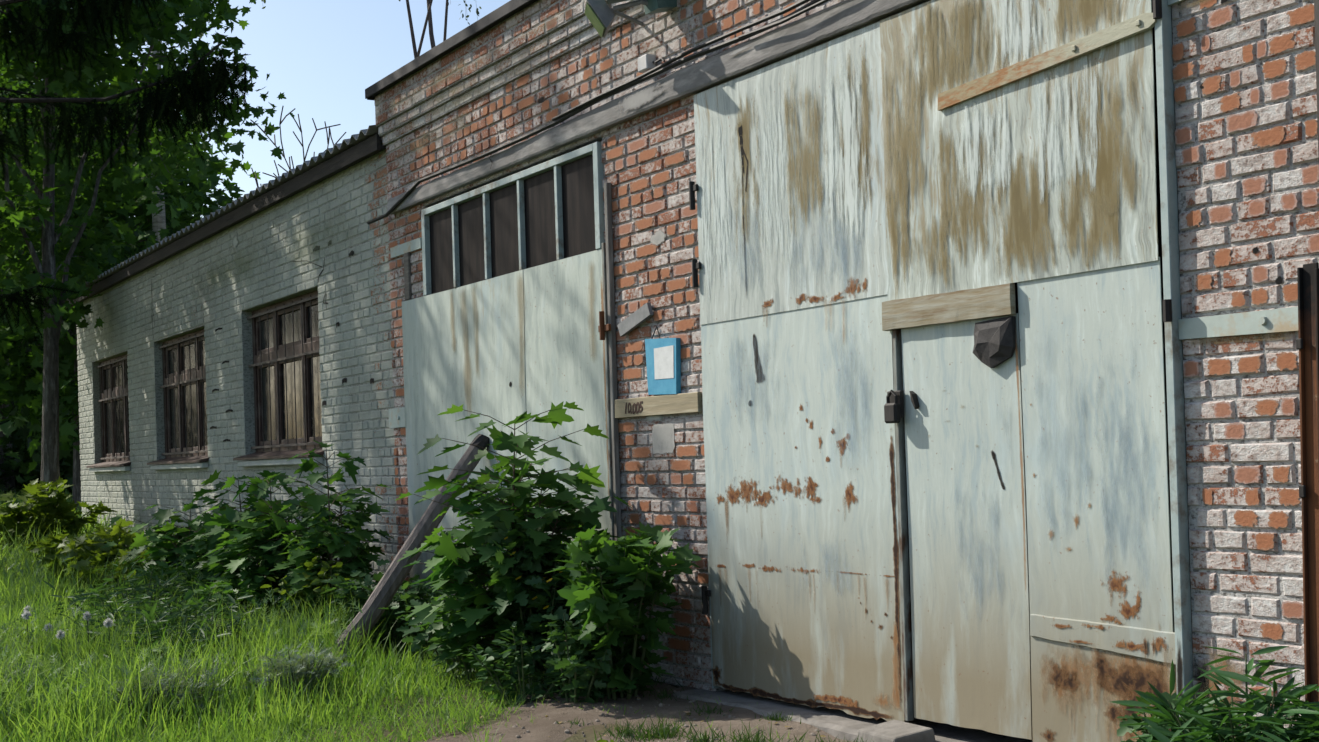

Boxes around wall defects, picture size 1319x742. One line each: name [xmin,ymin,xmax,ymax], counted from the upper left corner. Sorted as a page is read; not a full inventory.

damp [999,0,1041,63]
damp [824,67,869,244]
damp [959,95,1010,197]
damp [1037,56,1097,197]
peeling [1172,0,1319,227]
rust [796,278,867,304]
peeling [1231,266,1298,307]
rust [799,404,850,462]
peeling [1234,466,1300,551]
rust [712,436,901,719]
rust [1042,571,1174,742]
peeling [1260,601,1304,640]